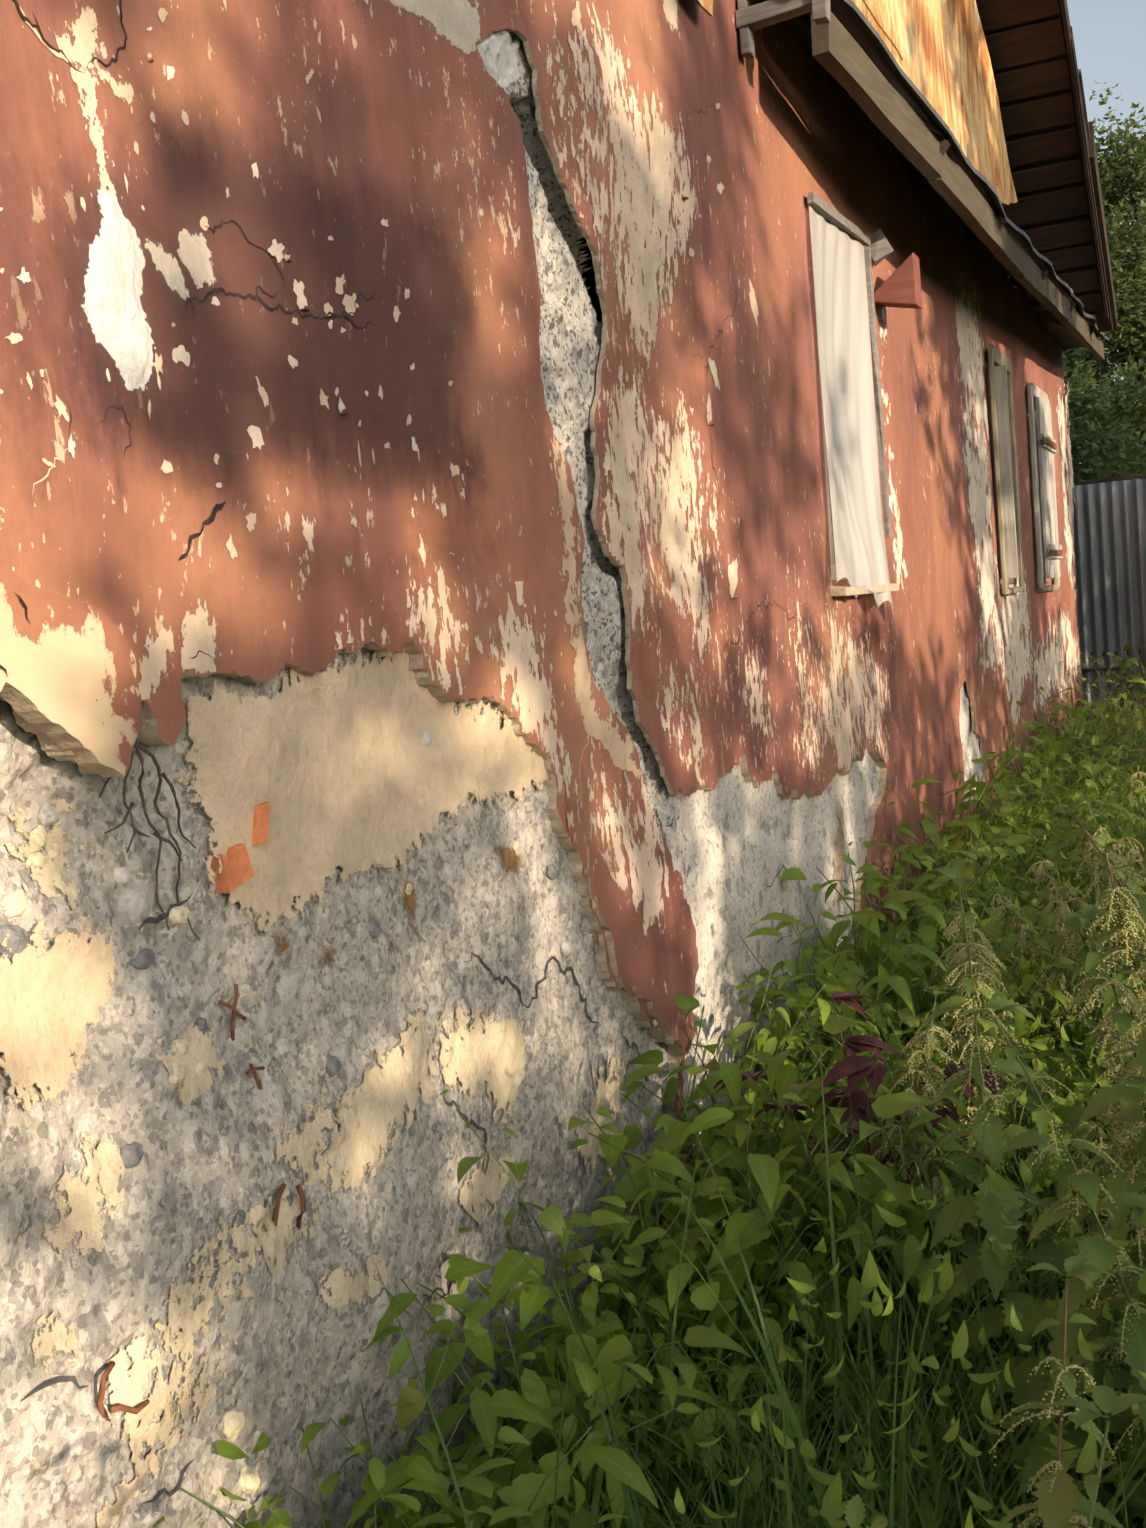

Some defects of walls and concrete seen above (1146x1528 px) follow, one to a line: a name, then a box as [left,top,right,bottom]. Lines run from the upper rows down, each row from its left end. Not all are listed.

crack [14,0,127,77]
corrosion [908,0,964,128]
corrosion [948,0,994,93]
crack [185,219,375,329]
crack [178,501,226,561]
crack [476,30,698,903]
peeling [955,278,1083,734]
spalling [0,0,899,1528]
spalling [959,684,983,805]